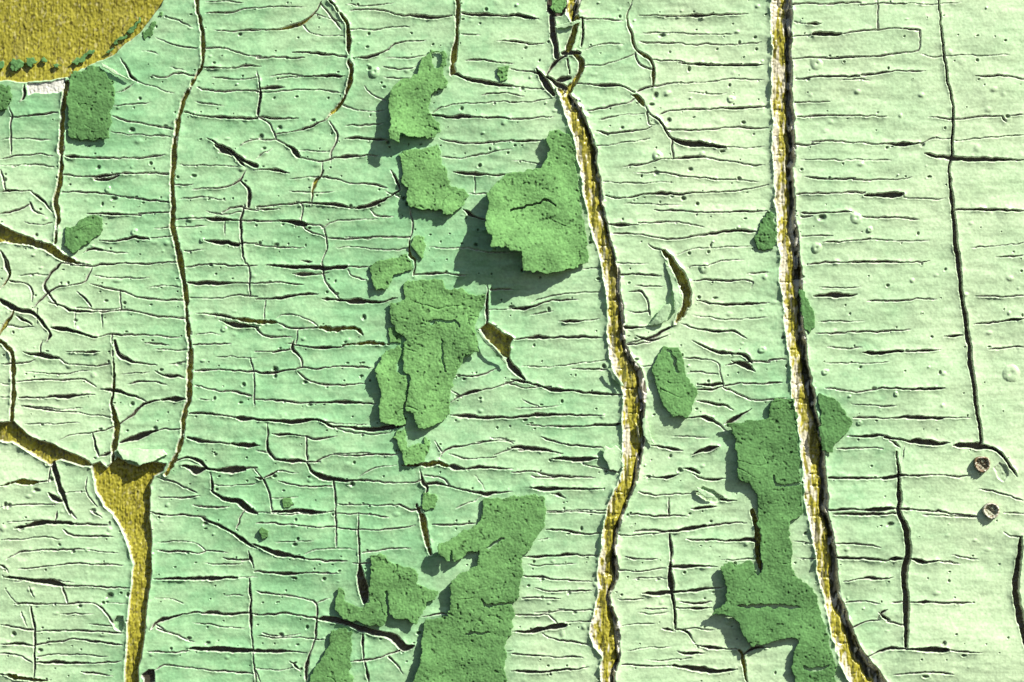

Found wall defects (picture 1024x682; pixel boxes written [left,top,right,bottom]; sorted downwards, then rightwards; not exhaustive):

peeling [0,215,103,266]
peeling [0,0,165,141]
peeling [388,49,469,215]
peeling [485,129,589,274]
peeling [754,211,777,251]
crack [0,0,789,682]
peeling [369,235,514,465]
peeling [652,346,698,419]
crack [792,0,1024,676]
peeling [0,420,169,682]
peeling [310,492,547,682]
peeling [712,398,837,682]